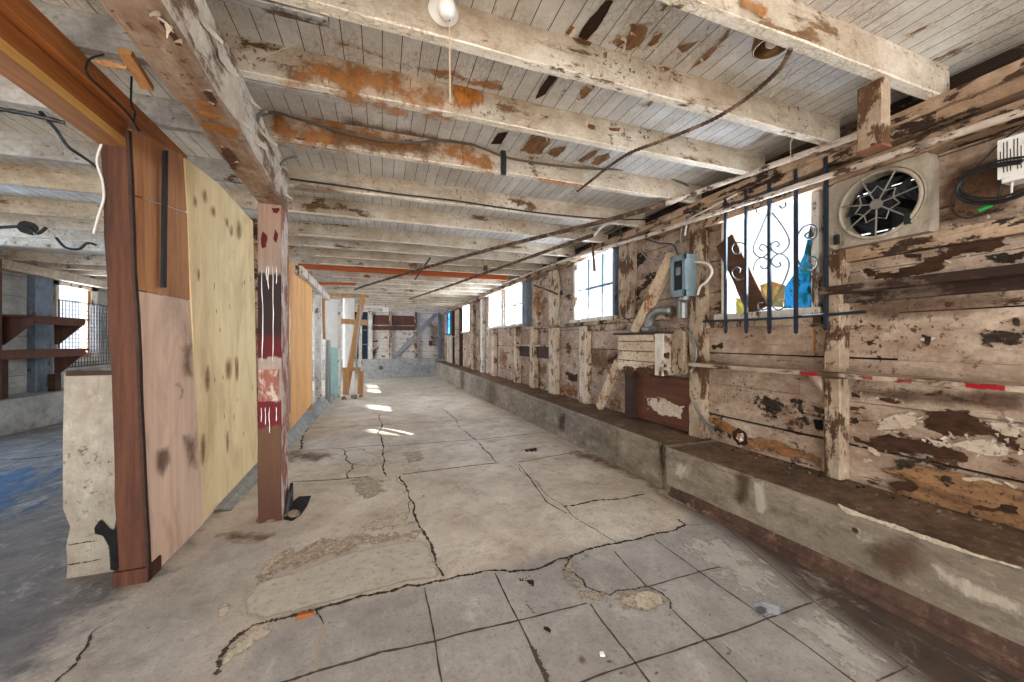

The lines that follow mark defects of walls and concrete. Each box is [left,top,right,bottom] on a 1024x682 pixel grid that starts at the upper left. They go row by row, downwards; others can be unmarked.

peeling [603,24,664,60]
peeling [660,25,731,71]
peeling [517,134,568,157]
peeling [860,237,1013,280]
peeling [637,272,656,300]
peeling [647,397,684,419]
peeling [851,392,1024,463]
leakage [158,451,168,472]
peeling [962,474,1017,489]
crack [213,408,710,676]
crack [55,619,114,682]
crack [530,646,549,682]